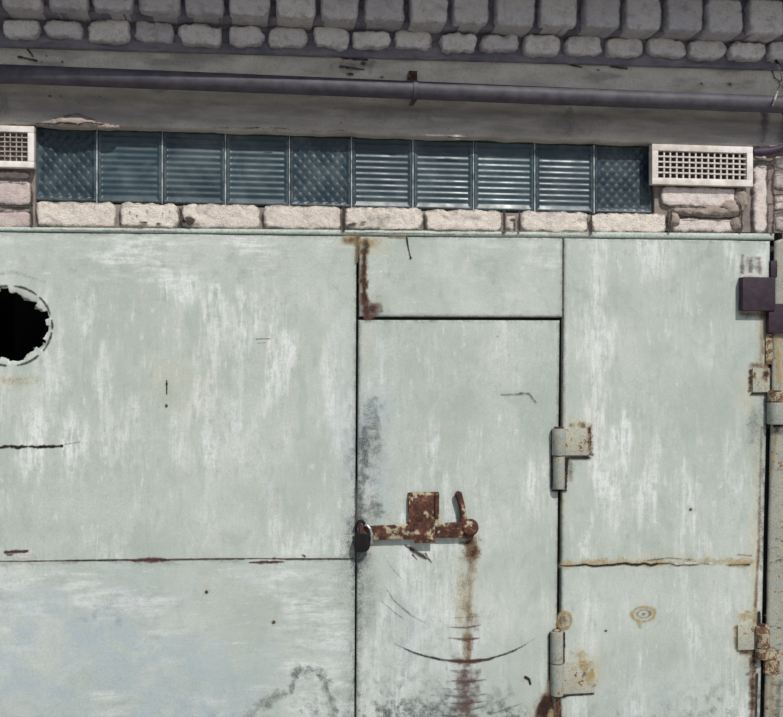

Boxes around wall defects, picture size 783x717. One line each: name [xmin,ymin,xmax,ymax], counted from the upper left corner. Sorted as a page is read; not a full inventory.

rust [343,235,360,262]
rust [748,337,782,395]
crack [559,504,783,567]
rust [739,460,762,624]
rust [451,537,480,717]
rust [536,651,596,717]
rust [735,626,759,717]
crack [767,673,783,717]